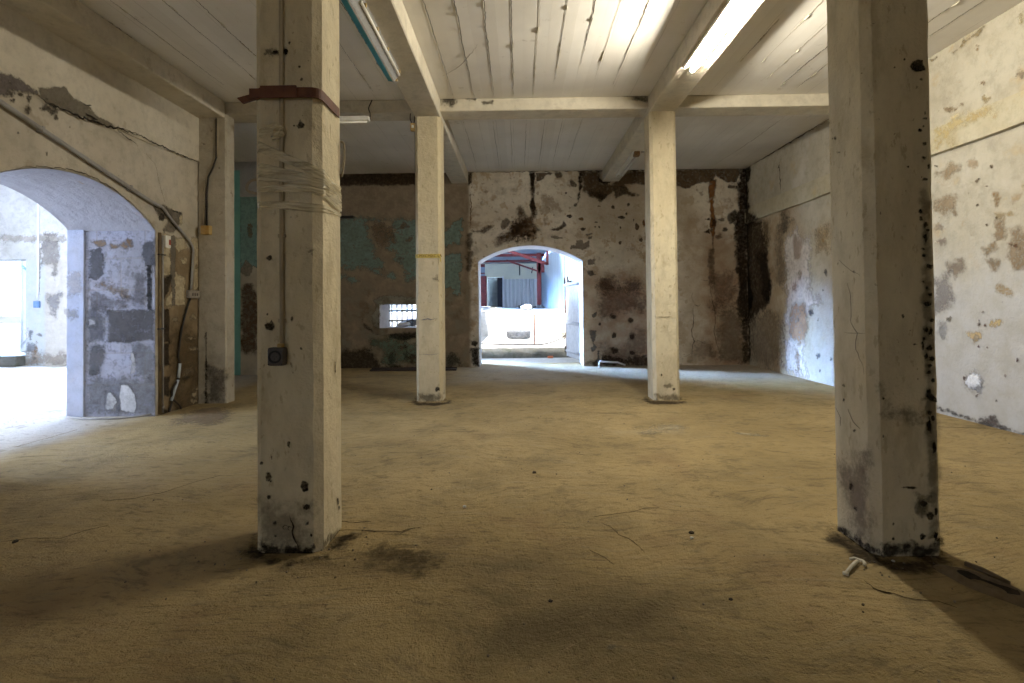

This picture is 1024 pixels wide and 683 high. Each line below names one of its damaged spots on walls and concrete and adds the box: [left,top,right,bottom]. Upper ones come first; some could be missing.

crack [423,0,649,98]
spalling [0,72,113,127]
crack [36,94,195,201]
water stain [536,170,645,206]
peeling [340,215,416,284]
peeling [433,218,464,295]
water stain [473,207,540,244]
water stain [600,278,647,318]
water stain [676,167,832,377]
peeling [967,311,1001,348]